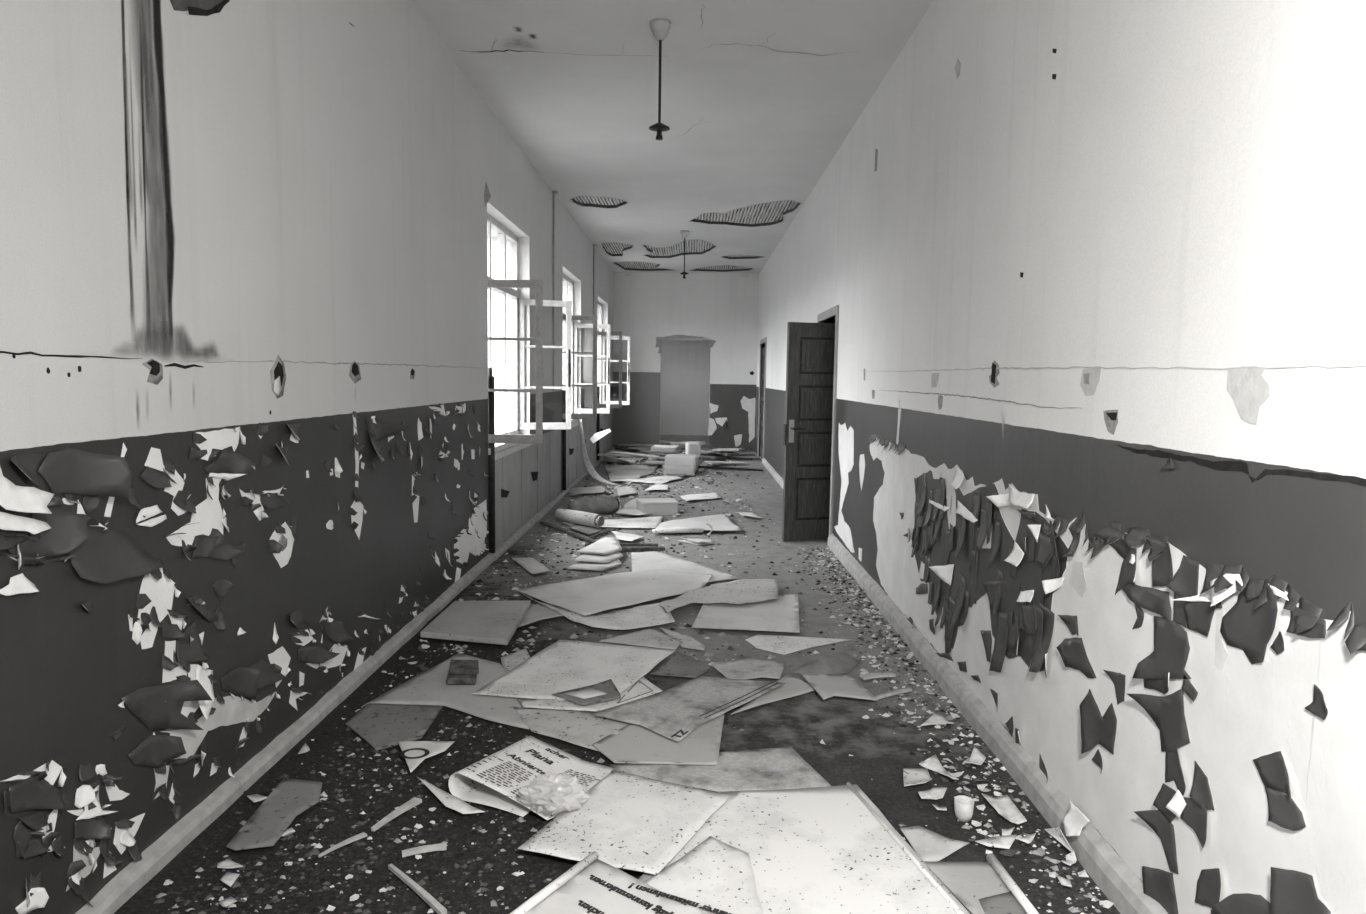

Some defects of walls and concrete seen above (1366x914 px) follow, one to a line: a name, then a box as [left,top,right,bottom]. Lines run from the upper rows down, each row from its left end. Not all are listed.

peeling [170,0,229,16]
crack [460,38,650,56]
crack [701,5,845,56]
water stain [121,0,213,356]
spalling [601,200,802,272]
spalling [270,355,286,399]
spalling [1080,368,1102,396]
spalling [1227,366,1271,425]
peeling [569,411,677,498]
peeling [686,396,756,507]
peeling [0,403,545,914]
peeling [803,409,1366,914]